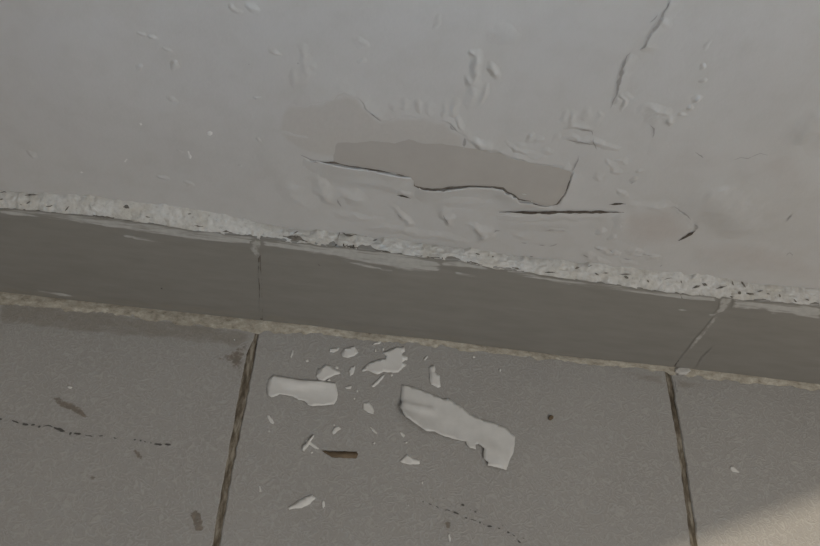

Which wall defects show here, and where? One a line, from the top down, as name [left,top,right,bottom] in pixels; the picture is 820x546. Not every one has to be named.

crack [610,0,684,109]
leakage [0,209,491,278]
peeling [0,78,820,305]